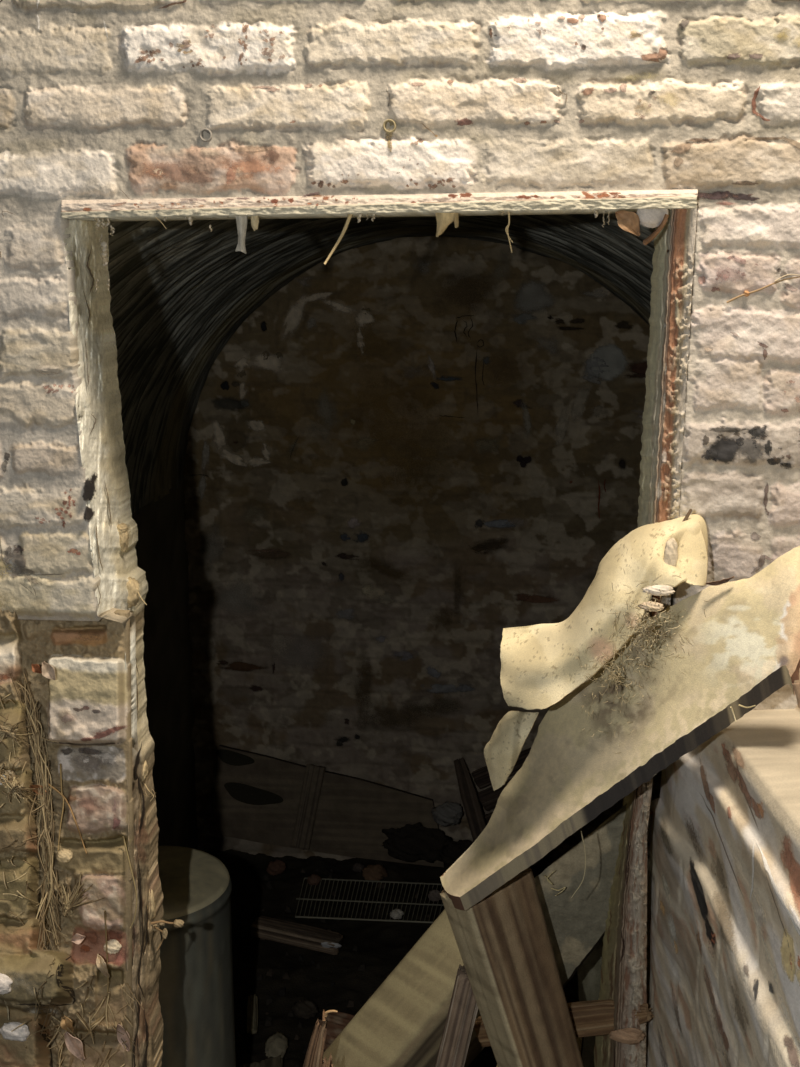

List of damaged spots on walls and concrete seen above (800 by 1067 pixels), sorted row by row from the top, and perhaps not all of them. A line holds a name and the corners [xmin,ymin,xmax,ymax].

peeling [702,425,791,469]
spalling [690,859,715,957]
peeling [704,967,729,1051]